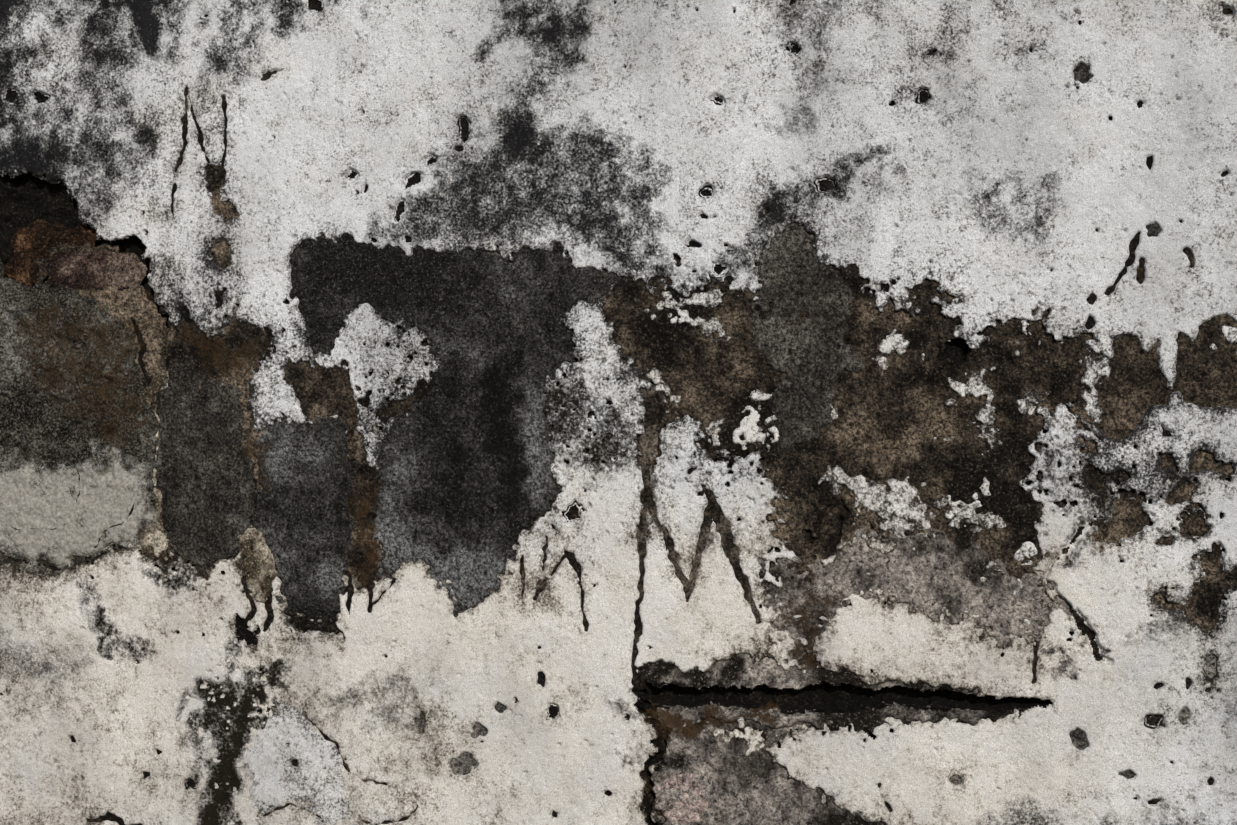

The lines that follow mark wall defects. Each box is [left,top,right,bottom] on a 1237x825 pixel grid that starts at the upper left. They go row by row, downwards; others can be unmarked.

leakage [0,0,189,222]
leakage [195,0,306,95]
spalling [394,157,436,222]
leakage [367,0,905,294]
spalling [0,171,1237,825]
leakage [177,678,205,785]
leakage [225,641,242,686]
crack [632,677,1053,825]